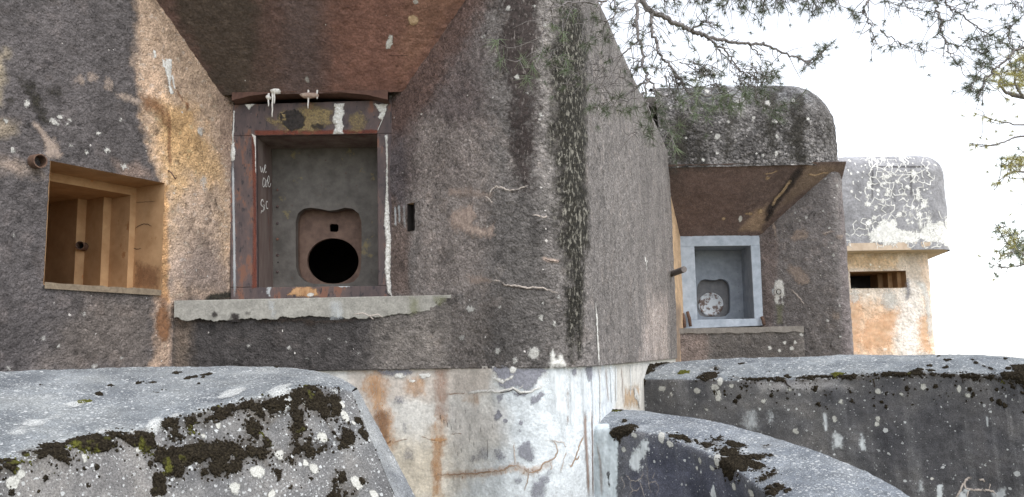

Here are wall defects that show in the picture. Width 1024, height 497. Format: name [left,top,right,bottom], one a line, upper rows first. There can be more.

peeling [268,103,333,134]
corrosion [252,130,378,293]
crack [823,156,950,249]
damp [493,0,649,497]
corrosion [288,287,318,297]
crack [493,279,548,290]
corrosion [363,376,393,446]
crack [449,387,541,395]
crack [444,437,584,487]